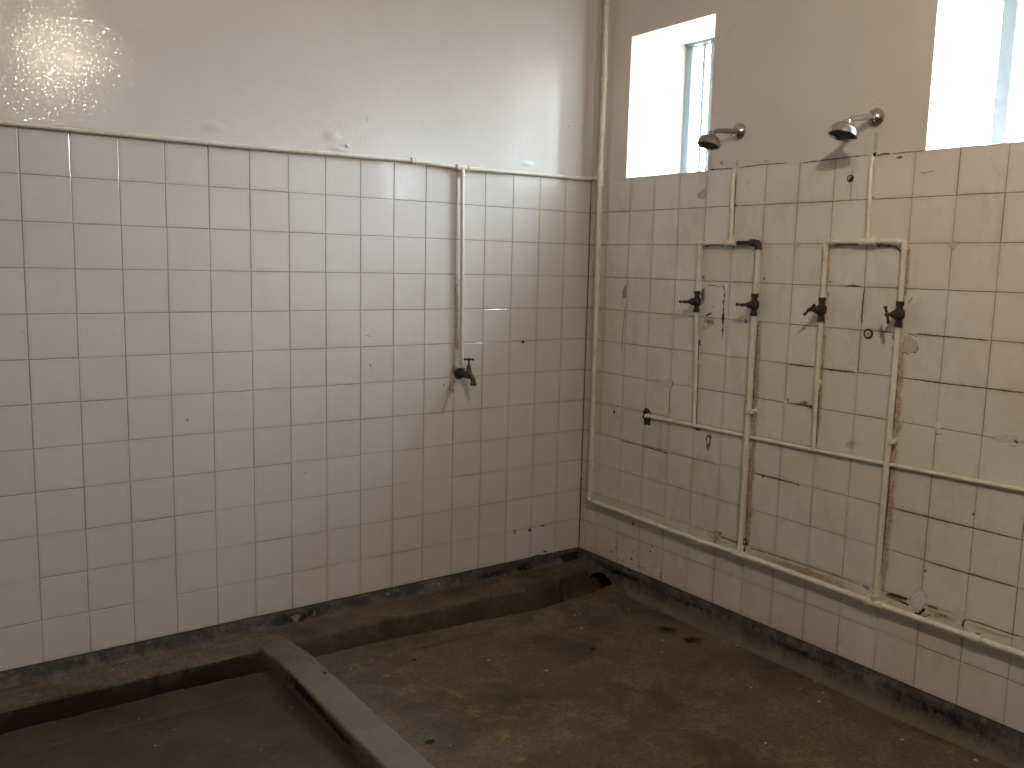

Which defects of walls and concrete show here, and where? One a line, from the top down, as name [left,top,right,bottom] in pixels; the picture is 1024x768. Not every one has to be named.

water stain [889,507,1018,539]